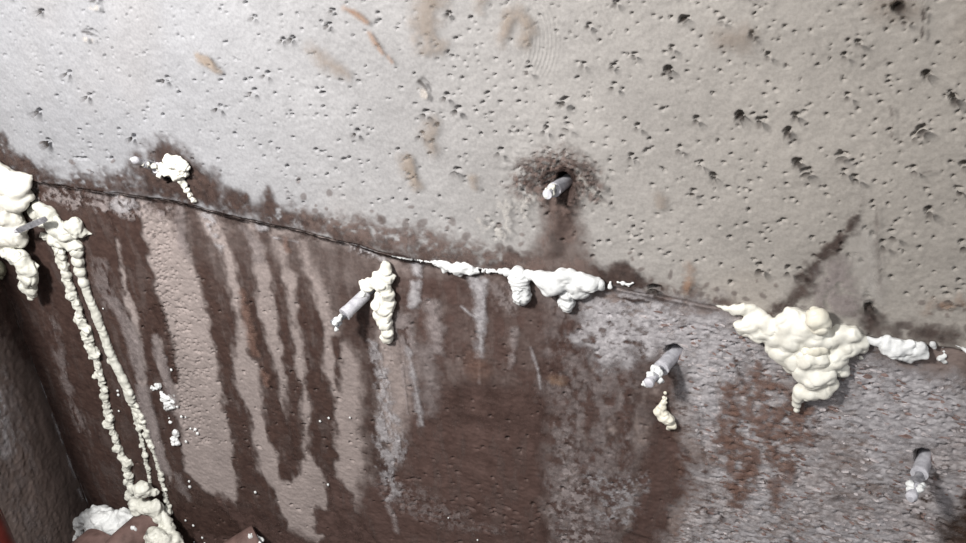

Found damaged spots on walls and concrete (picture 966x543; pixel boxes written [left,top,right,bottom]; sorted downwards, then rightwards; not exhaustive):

crack [33,182,435,267]
damp [0,133,797,543]
crack [610,290,682,304]
damp [767,215,955,343]
damp [804,369,966,452]
damp [920,469,966,543]